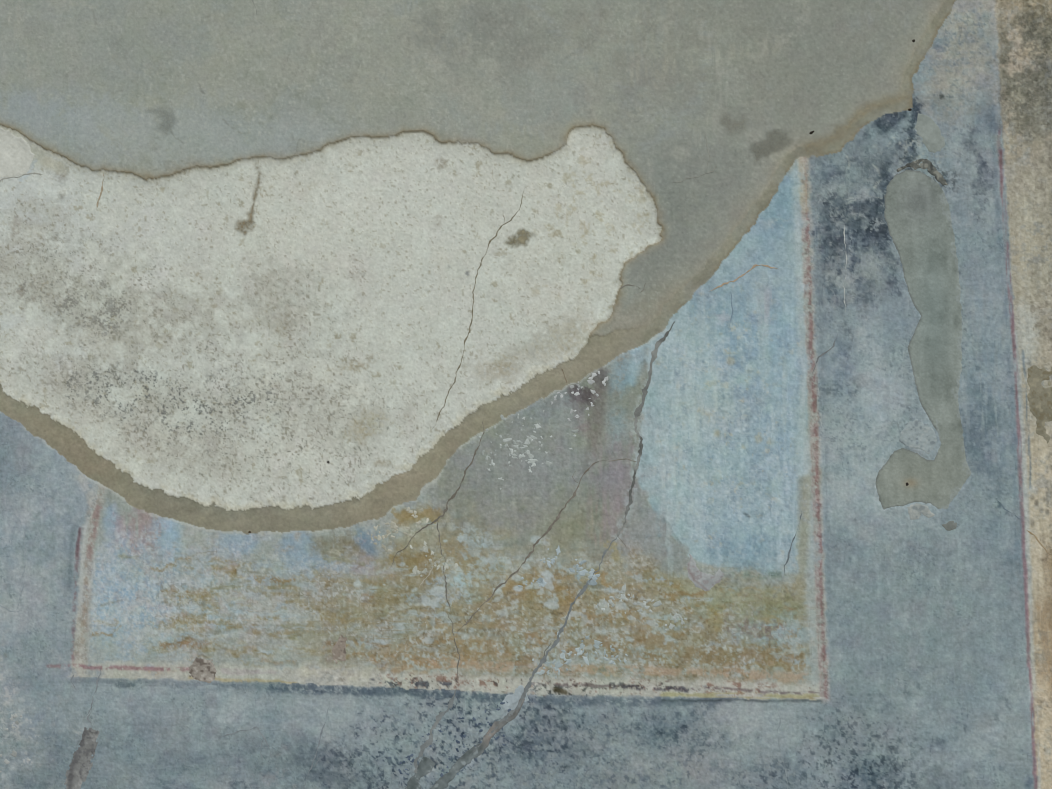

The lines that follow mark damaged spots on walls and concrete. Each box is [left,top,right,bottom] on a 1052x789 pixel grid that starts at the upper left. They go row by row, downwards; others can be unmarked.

spalling [897,159,948,185]
crack [427,195,523,436]
peeling [470,371,608,490]
crack [393,321,675,773]
peeling [569,559,600,586]
spalling [64,727,99,789]